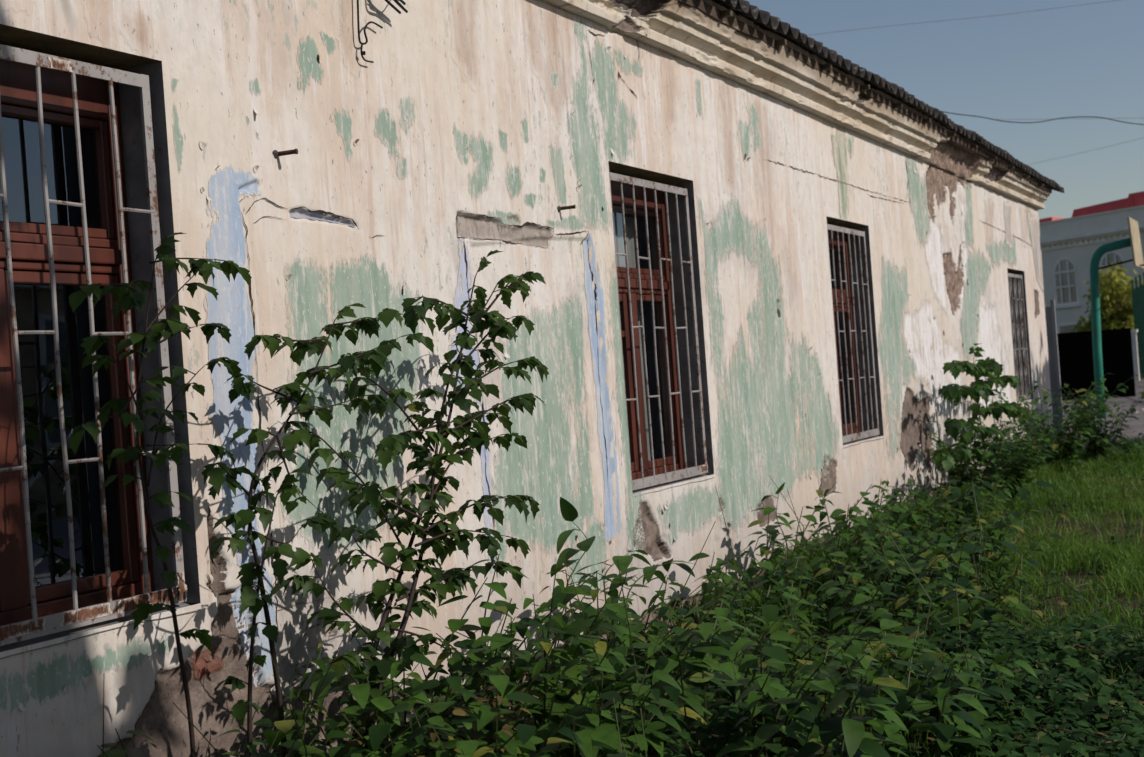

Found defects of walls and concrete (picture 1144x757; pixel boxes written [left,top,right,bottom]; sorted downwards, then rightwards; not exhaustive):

rust [48,57,73,72]
peeling [172,77,184,173]
peeling [246,78,261,139]
spalling [289,208,356,227]
peeling [449,18,840,596]
peeling [878,155,1017,473]
peeling [201,164,277,687]
rust [60,571,188,626]
peeling [0,631,170,716]